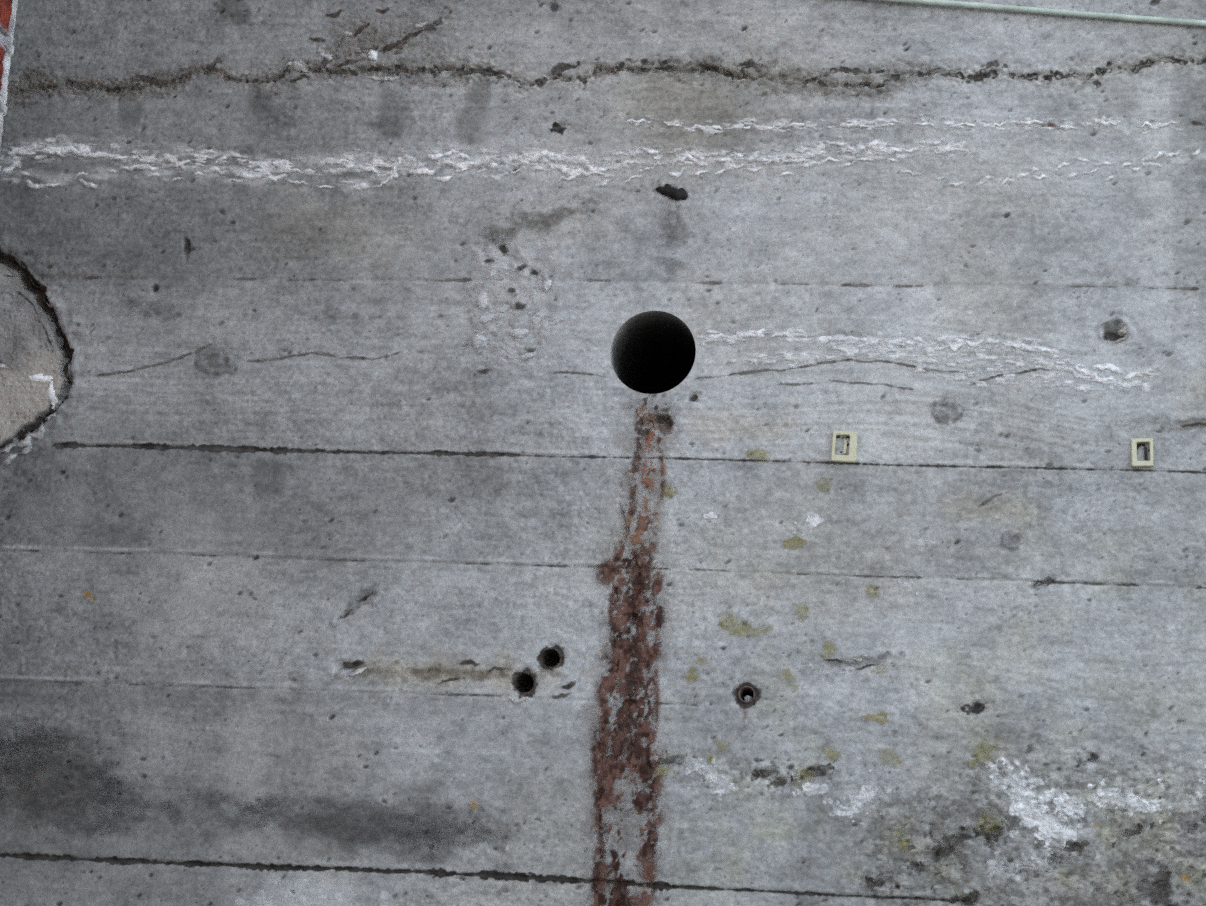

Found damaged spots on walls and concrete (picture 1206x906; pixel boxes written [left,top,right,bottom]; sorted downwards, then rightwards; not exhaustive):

crack [15,0,1206,95]
efflorescence [0,116,1200,190]
spalling [0,252,74,465]
efflorescence [700,327,1159,391]
corrosion [592,394,666,906]
efflorescence [988,757,1172,880]